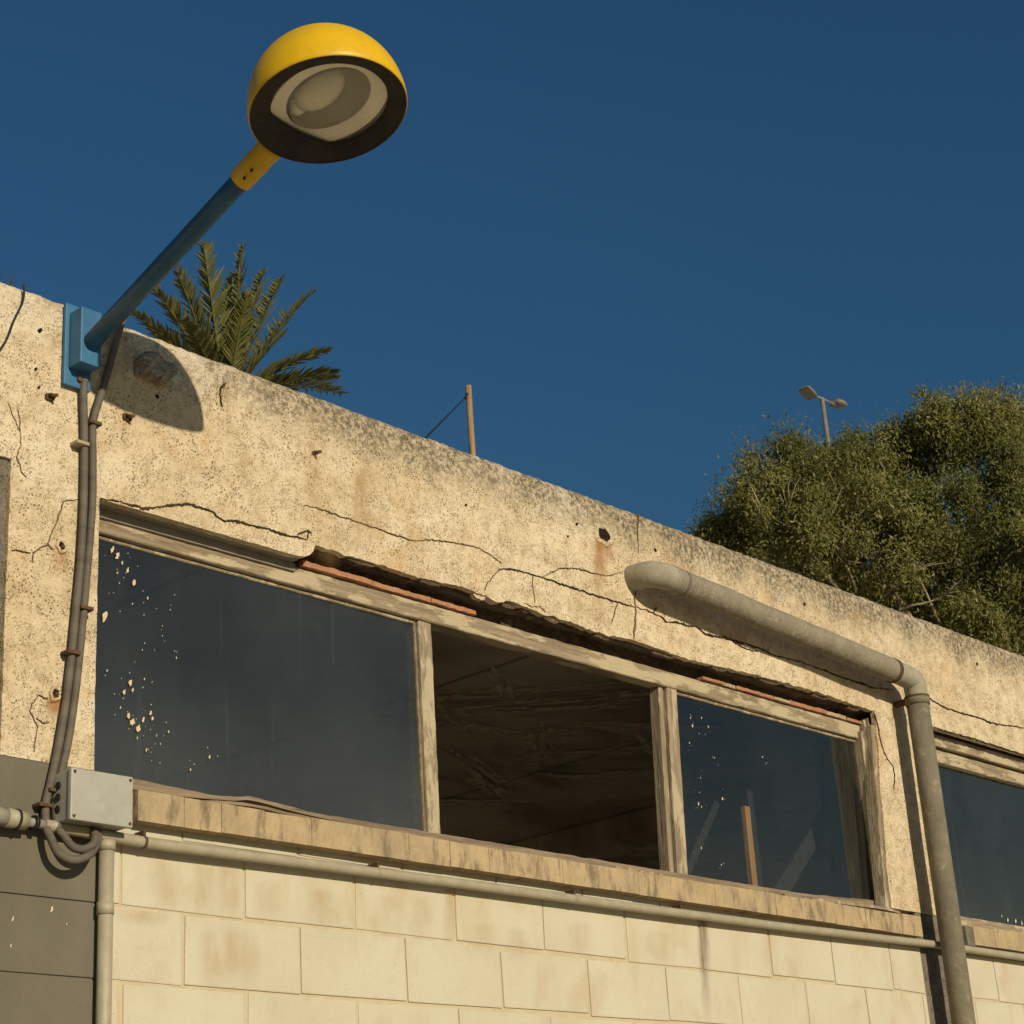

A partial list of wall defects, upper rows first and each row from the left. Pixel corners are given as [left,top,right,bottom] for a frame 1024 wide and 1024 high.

crack [11,498,893,690]
spalling [313,549,865,712]
crack [29,695,49,752]
crack [930,698,1024,755]